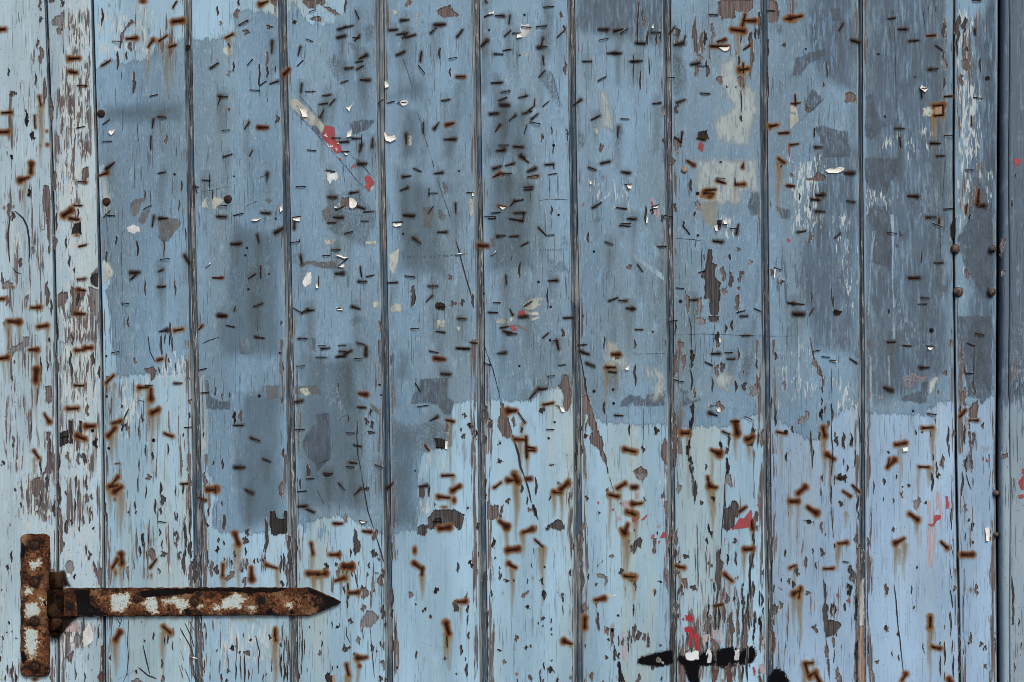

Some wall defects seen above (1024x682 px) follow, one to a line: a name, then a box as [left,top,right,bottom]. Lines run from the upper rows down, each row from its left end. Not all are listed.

rust [16,160,35,188]
rust [0,318,50,361]
peeling [0,0,523,682]
peeling [517,0,1008,682]
rust [136,384,175,439]
rust [231,530,361,609]
rust [435,473,463,508]
rust [492,406,537,510]
rust [497,518,546,594]
rust [607,480,644,582]
rust [710,419,756,459]
rust [787,483,821,518]